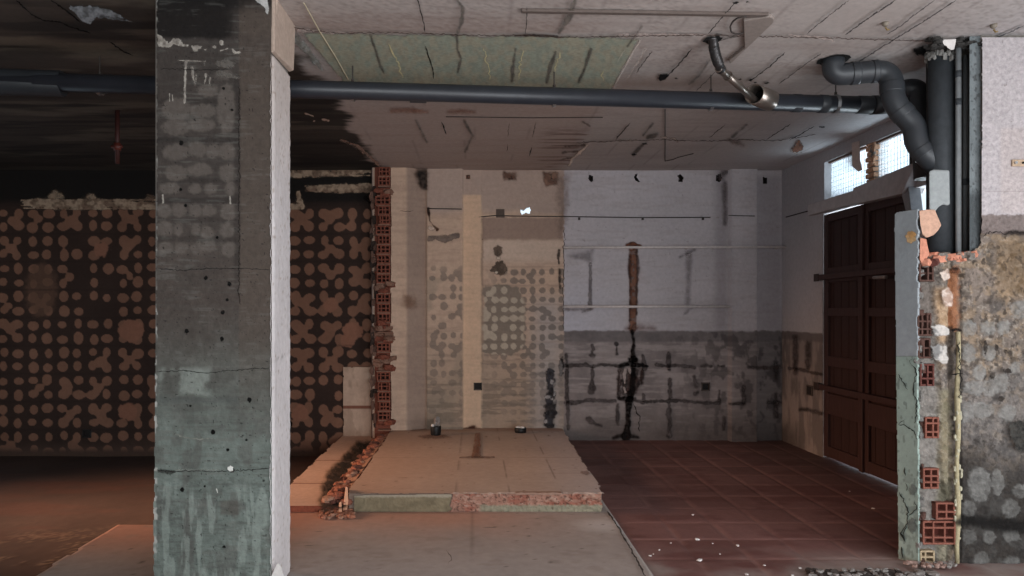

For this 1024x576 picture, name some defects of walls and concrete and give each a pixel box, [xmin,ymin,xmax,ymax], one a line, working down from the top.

peeling [69,5,132,24]
flaking render [20,191,156,210]
corrosion [626,242,641,332]
spalling [905,210,961,306]
leakage [613,329,648,440]
crack [898,359,918,439]
spalling [922,416,940,439]
flaking render [917,313,961,386]
crack [899,467,918,557]
spalling [908,467,956,563]